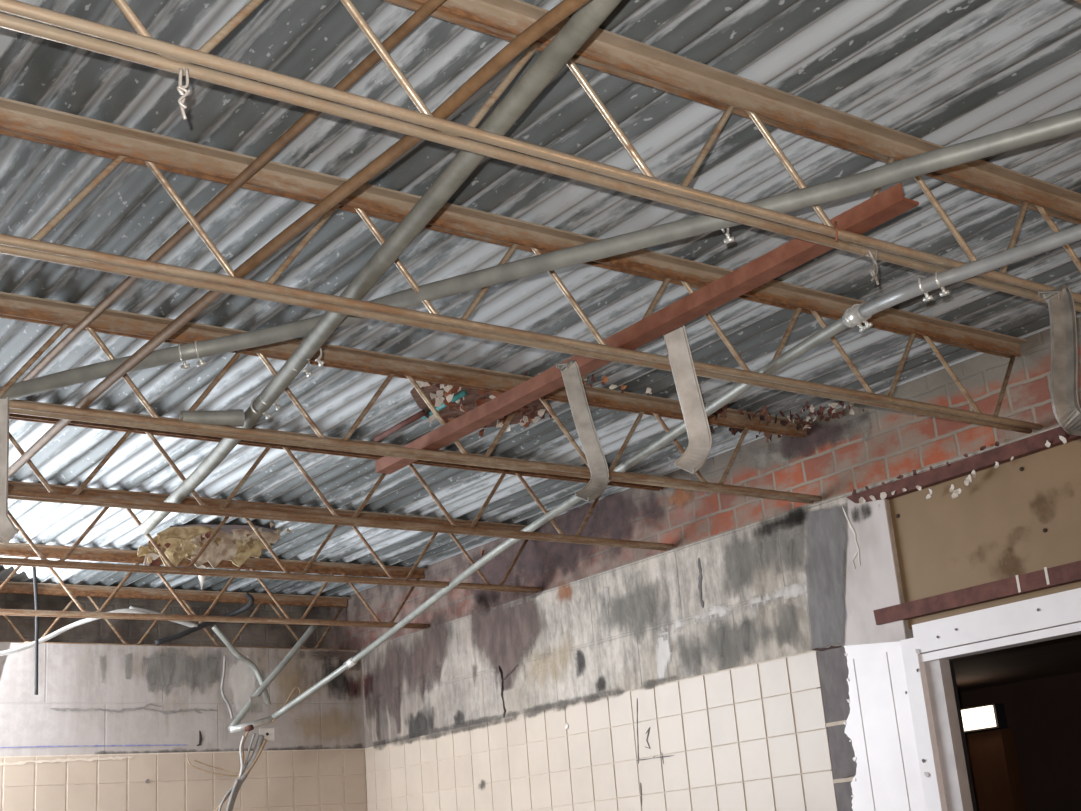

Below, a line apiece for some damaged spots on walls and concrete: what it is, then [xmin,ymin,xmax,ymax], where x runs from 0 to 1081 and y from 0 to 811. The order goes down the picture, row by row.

peeling [859,485,932,505]
peeling [950,470,976,498]
water stain [301,616,622,749]
water stain [471,592,541,689]
crack [500,665,518,718]
peeling [806,505,857,811]